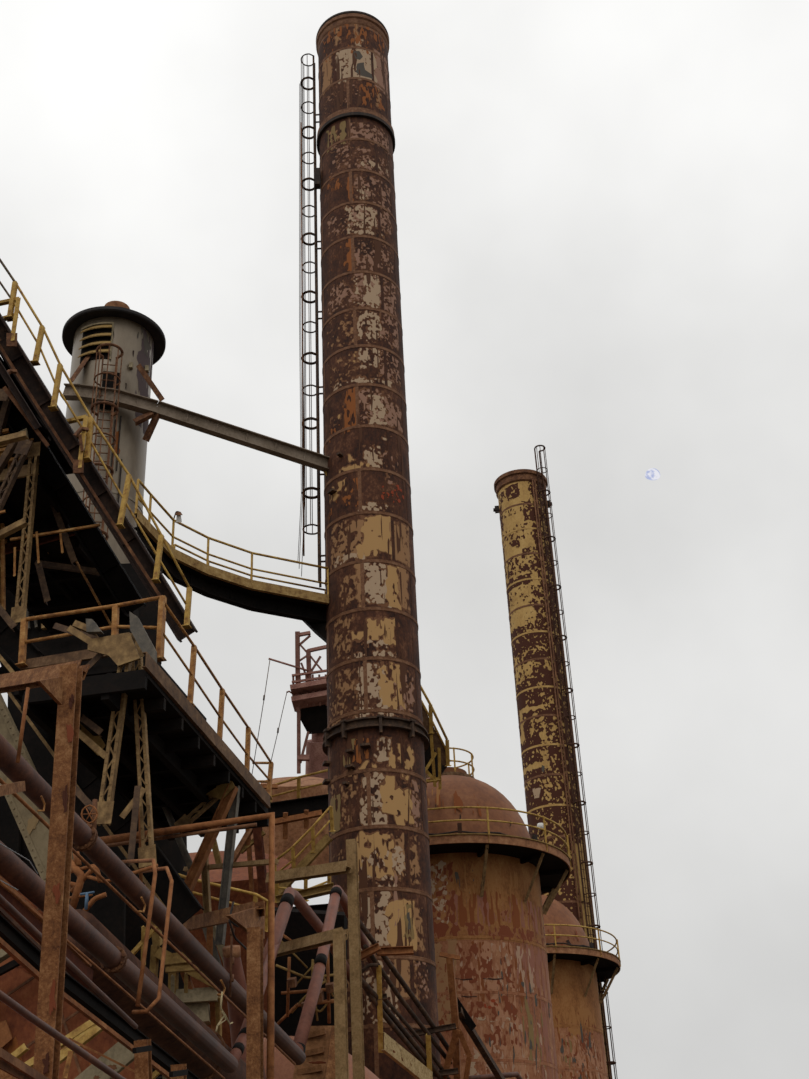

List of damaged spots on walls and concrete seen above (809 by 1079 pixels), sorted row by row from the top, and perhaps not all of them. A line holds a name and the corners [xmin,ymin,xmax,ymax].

peeling [322,24,389,114]
corrosion [323,24,391,156]
corrosion [325,168,401,313]
peeling [327,122,403,504]
corrosion [327,330,378,445]
corrosion [334,454,368,709]
corrosion [378,484,409,611]
corrosion [388,655,408,719]
corrosion [499,481,581,922]
corrosion [359,848,375,926]
peeling [329,736,430,1031]
corrosion [396,780,421,946]